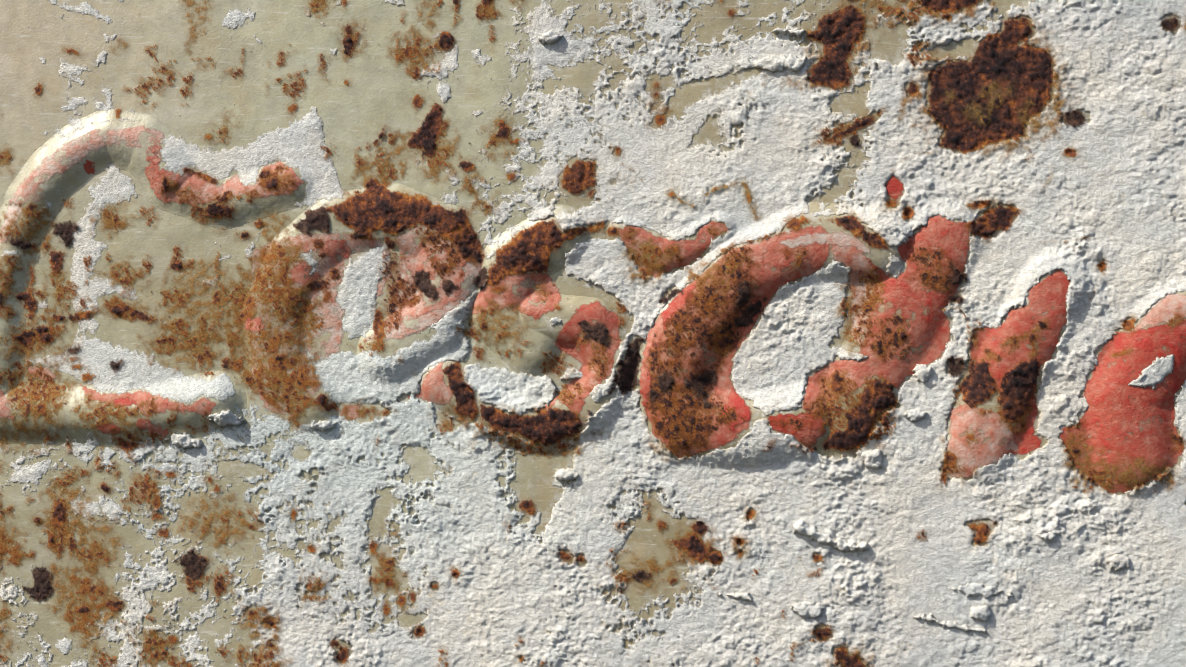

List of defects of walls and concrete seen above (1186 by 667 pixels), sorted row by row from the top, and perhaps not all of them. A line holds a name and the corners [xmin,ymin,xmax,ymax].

rust [789,0,979,89]
rust [899,16,1065,154]
peeling [0,0,345,313]
peeling [466,0,857,366]
peeling [0,436,71,495]
peeling [81,385,216,417]
peeling [245,232,392,384]
rust [0,94,897,471]
peeling [731,226,870,416]
rust [947,321,1051,434]
rust [121,469,260,602]
rust [606,501,745,594]